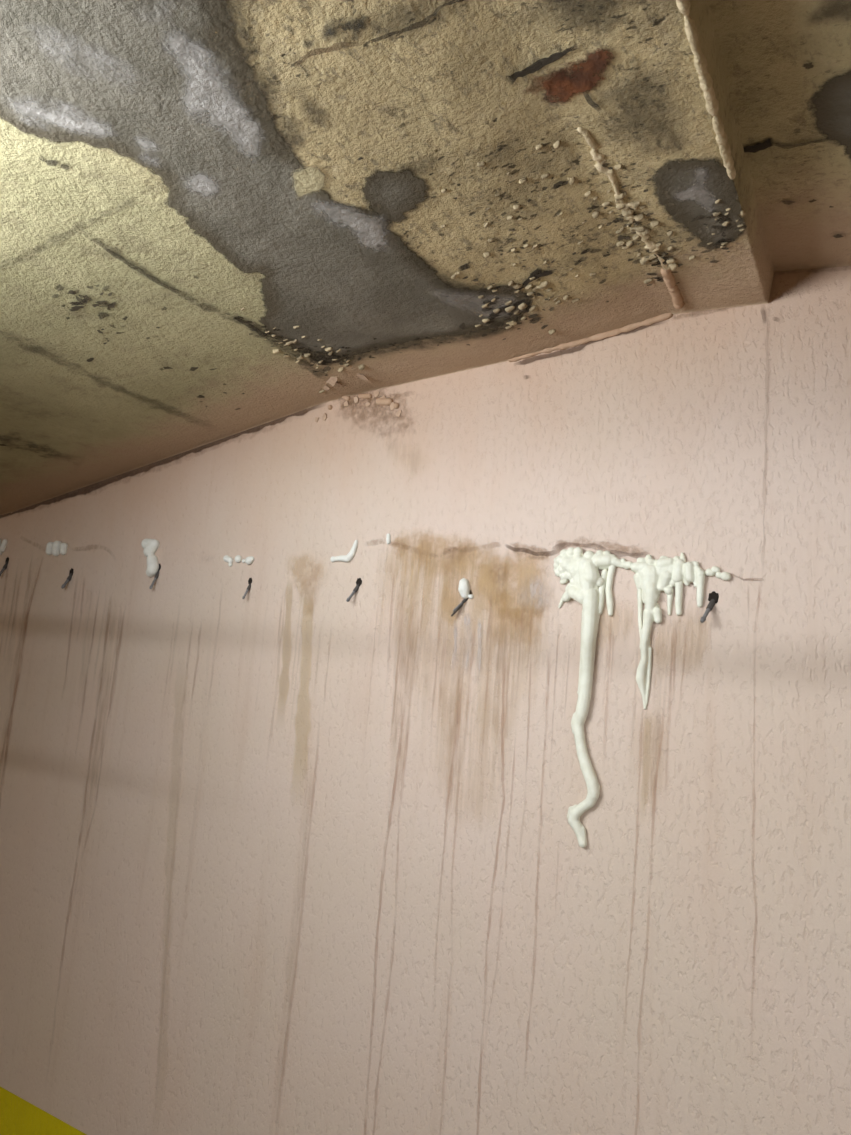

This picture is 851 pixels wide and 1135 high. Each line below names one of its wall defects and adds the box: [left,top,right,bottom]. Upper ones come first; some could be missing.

rust [507,45,614,110]
leakage [807,70,851,159]
leakage [0,0,532,365]
leakage [650,158,745,250]